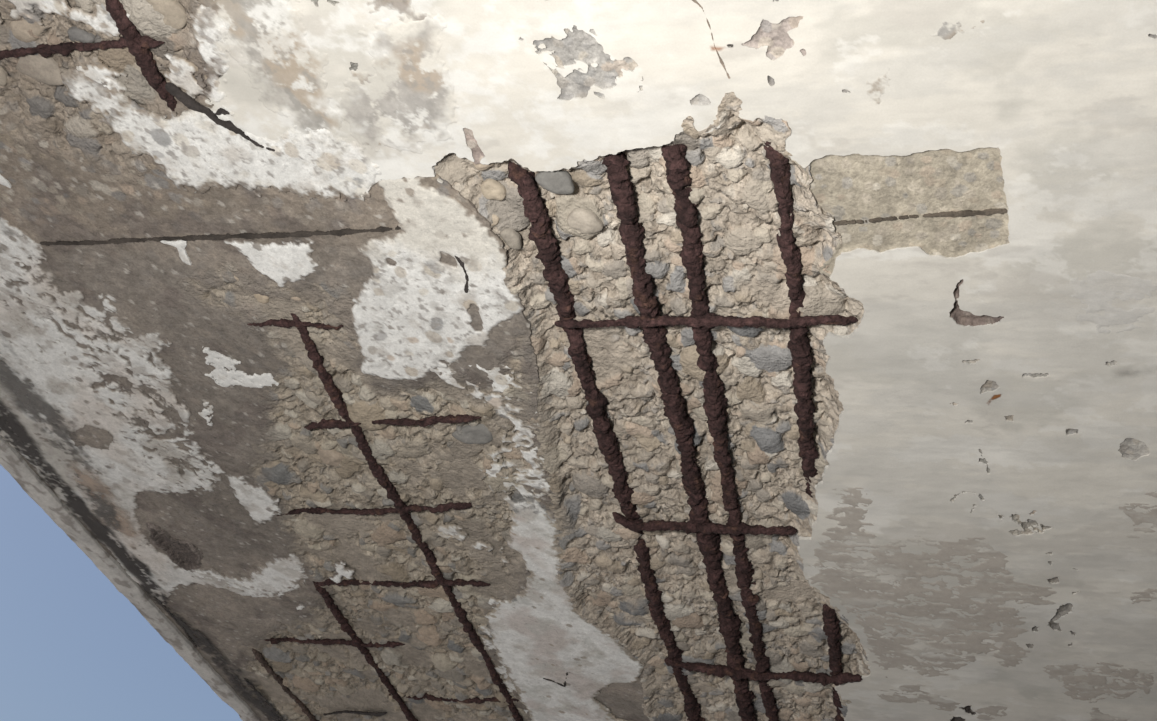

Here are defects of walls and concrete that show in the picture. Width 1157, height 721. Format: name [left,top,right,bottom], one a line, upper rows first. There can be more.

peeling [728,16,806,60]
damp [0,360,284,721]
spalling [0,0,741,721]
spalling [617,92,1073,721]